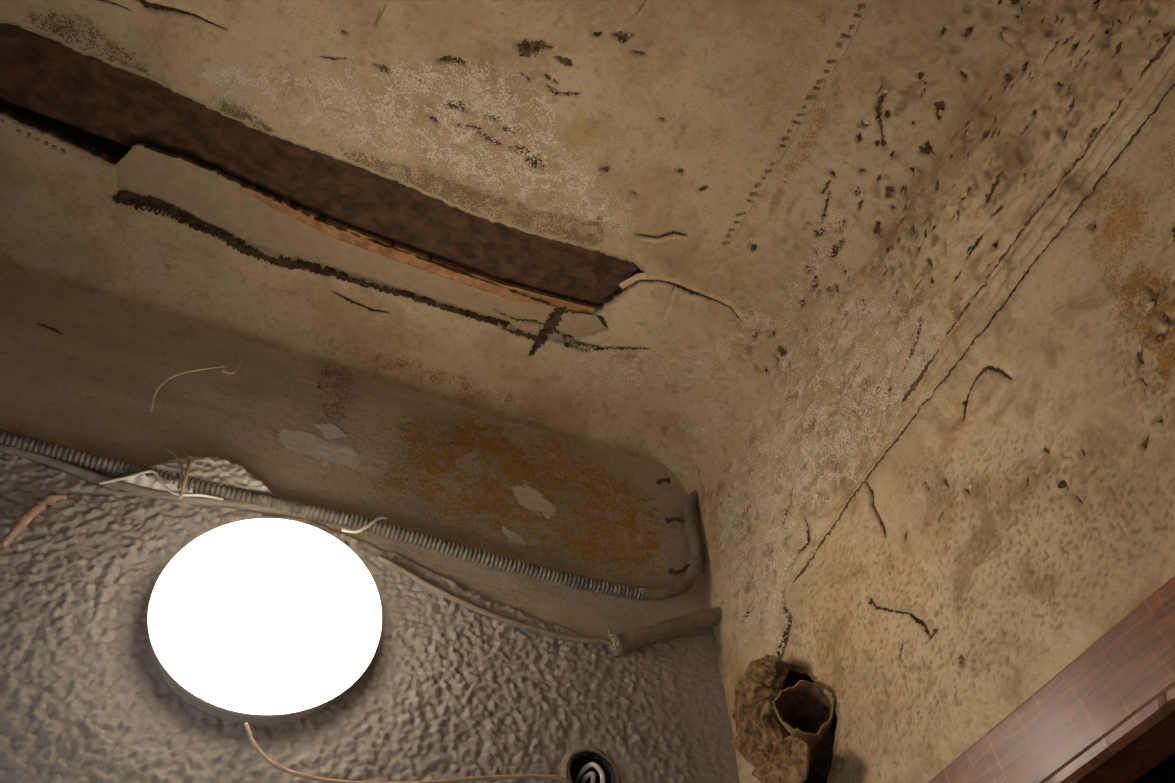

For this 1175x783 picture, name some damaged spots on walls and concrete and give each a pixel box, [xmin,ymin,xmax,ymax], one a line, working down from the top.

crack [98,0,227,30]
peeling [1045,0,1143,68]
crack [113,190,652,355]
crack [636,231,687,243]
crack [619,273,745,322]
peeling [966,233,1001,258]
peeling [977,159,1003,221]
corrosion [1070,124,1175,418]
peeling [0,9,960,689]
crack [740,30,1175,660]
damp [357,405,672,585]
spalling [803,689,842,783]